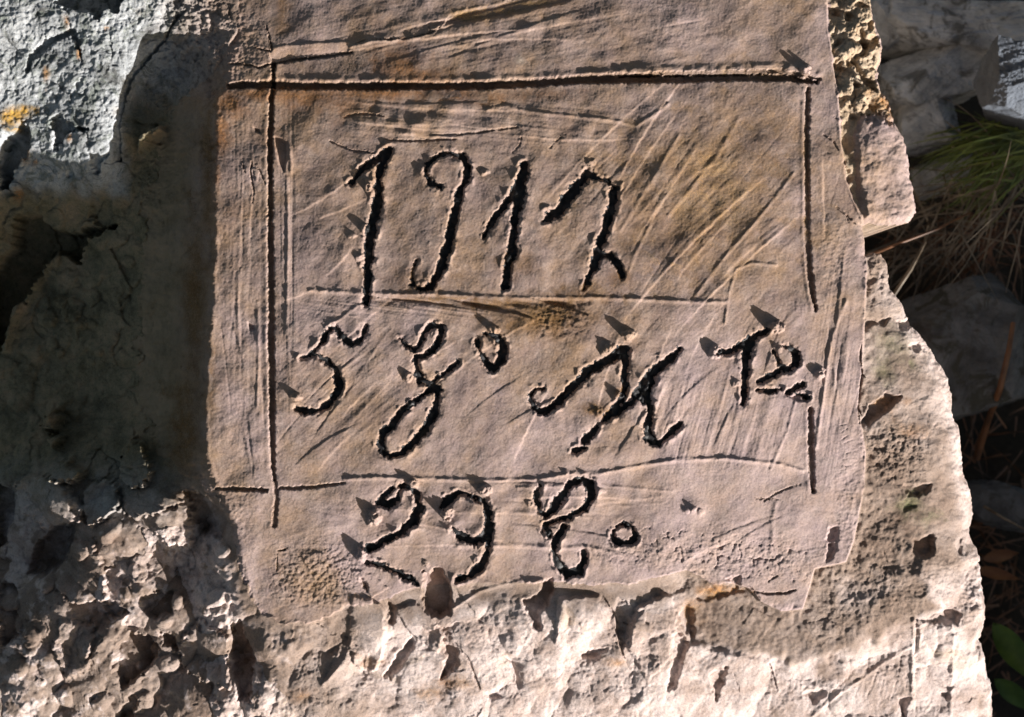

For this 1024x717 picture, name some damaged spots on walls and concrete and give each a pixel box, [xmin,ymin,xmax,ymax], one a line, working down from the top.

spalling [823,0,889,224]